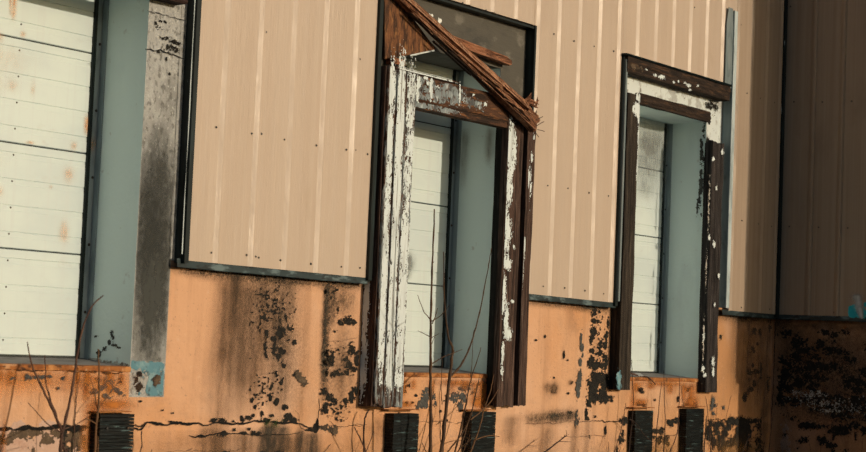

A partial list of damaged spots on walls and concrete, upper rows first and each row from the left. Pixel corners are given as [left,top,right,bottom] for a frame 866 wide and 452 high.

water stain [136,154,170,357]
water stain [181,268,315,314]
water stain [321,281,360,389]
peeling [210,48,487,437]
peeling [500,115,526,381]
peeling [695,100,723,286]
peeling [0,420,87,452]
rust [77,372,127,428]
crack [134,403,367,452]